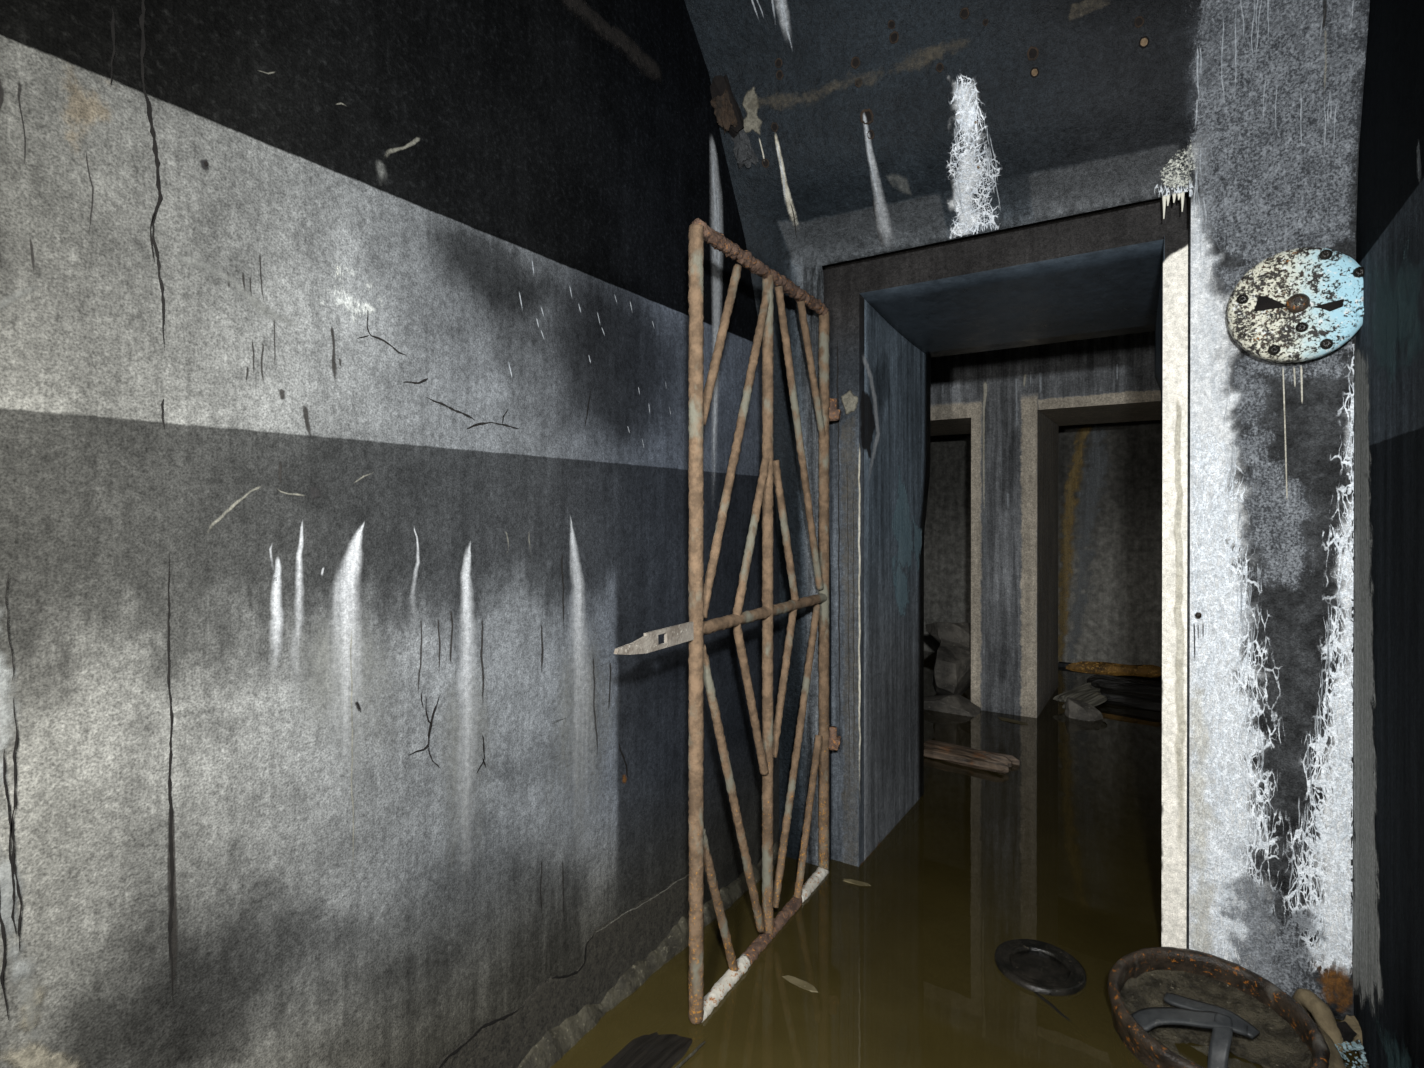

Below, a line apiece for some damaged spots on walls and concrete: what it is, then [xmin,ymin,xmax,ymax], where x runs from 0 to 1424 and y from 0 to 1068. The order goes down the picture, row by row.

water stain [751,0,790,40]
crack [111,0,165,342]
water stain [947,75,1000,239]
crack [159,399,167,429]
water stain [1154,0,1382,1013]
water stain [273,560,281,635]
water stain [323,634,354,691]
water stain [343,526,363,610]
water stain [418,547,484,697]
water stain [561,521,581,626]
water stain [577,660,611,747]
crack [0,575,30,1020]